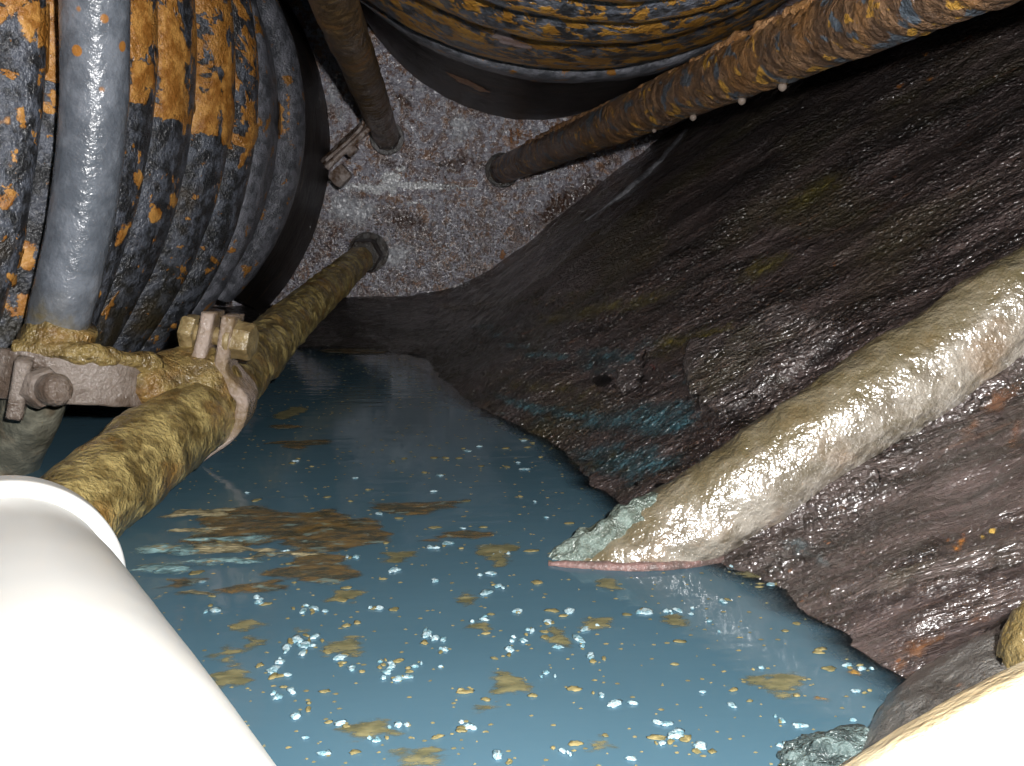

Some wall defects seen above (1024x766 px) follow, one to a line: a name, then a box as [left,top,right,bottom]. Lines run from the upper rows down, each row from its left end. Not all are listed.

corrosion [628,0,813,93]
corrosion [540,175,601,223]